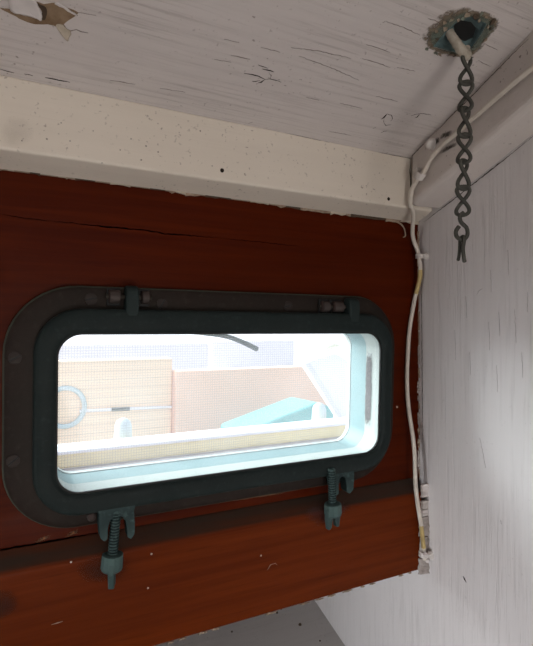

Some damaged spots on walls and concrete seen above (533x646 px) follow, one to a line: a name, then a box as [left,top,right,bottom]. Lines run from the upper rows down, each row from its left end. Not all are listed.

peeling [1,0,96,41]
peeling [424,8,498,58]
crack [214,39,280,83]
crack [4,214,294,246]